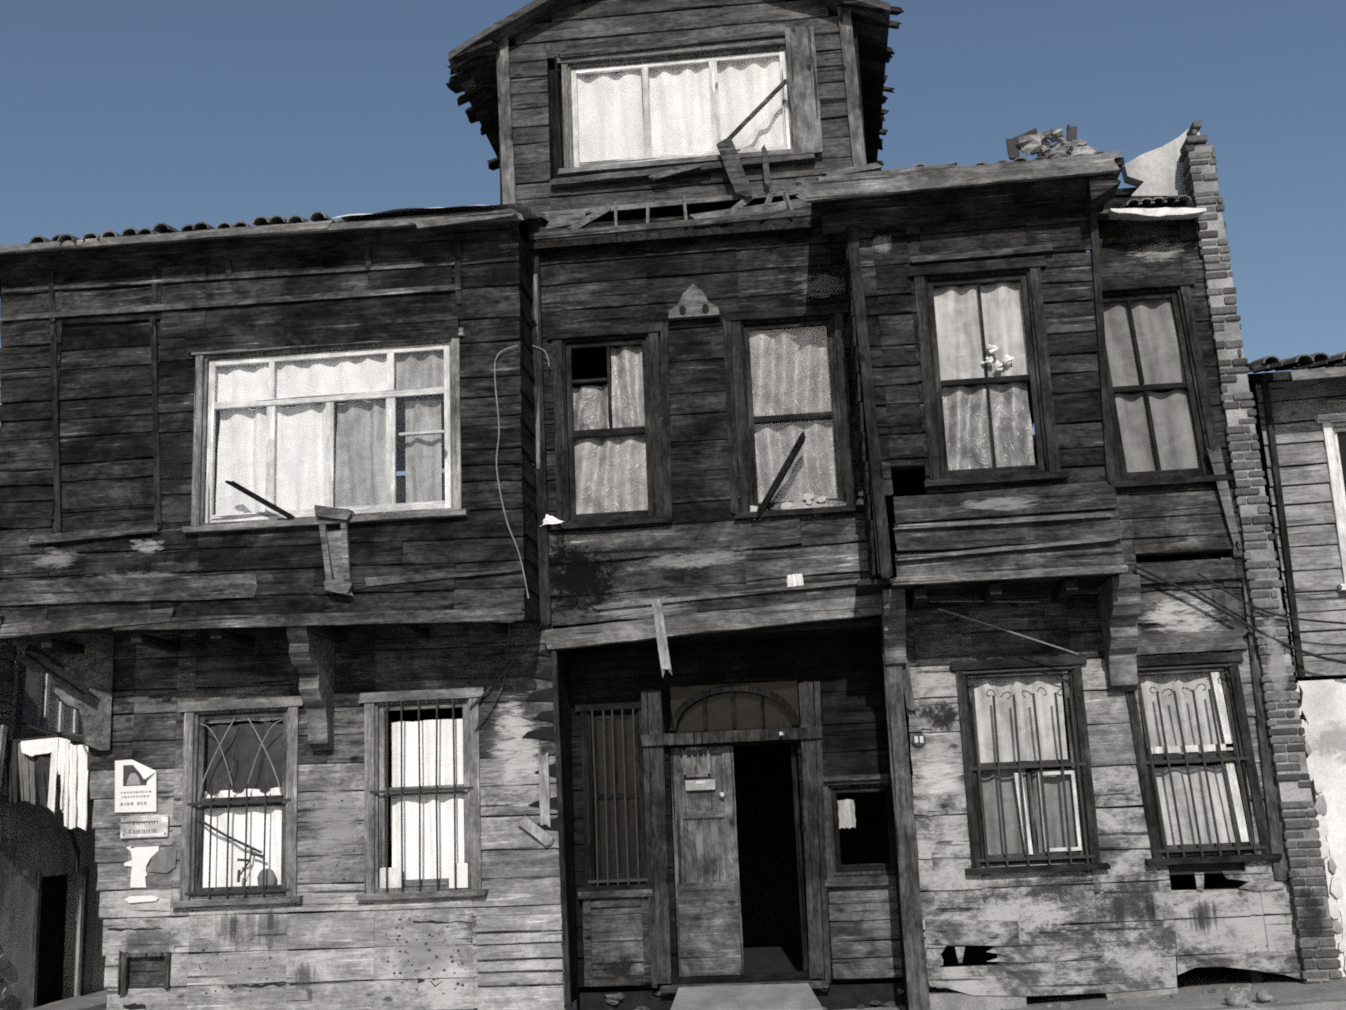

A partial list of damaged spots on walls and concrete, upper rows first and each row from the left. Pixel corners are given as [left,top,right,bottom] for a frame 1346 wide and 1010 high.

leakage [1027,883,1067,901]
leakage [1103,875,1155,929]
leakage [1193,902,1216,928]
leakage [1300,890,1324,937]